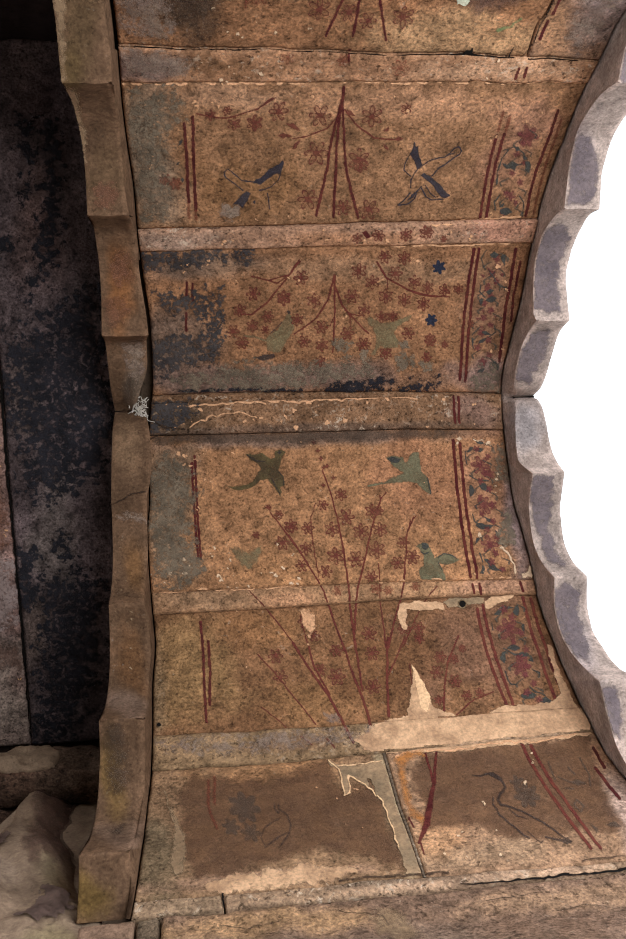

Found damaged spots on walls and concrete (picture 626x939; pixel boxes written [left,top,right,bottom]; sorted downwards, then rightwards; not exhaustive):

crack [117,0,600,62]
damp [169,339,375,394]
flaking render [198,559,302,599]
flaking render [293,600,315,645]
flaking render [397,595,514,630]
flaking render [328,645,592,876]
crack [339,855,626,901]